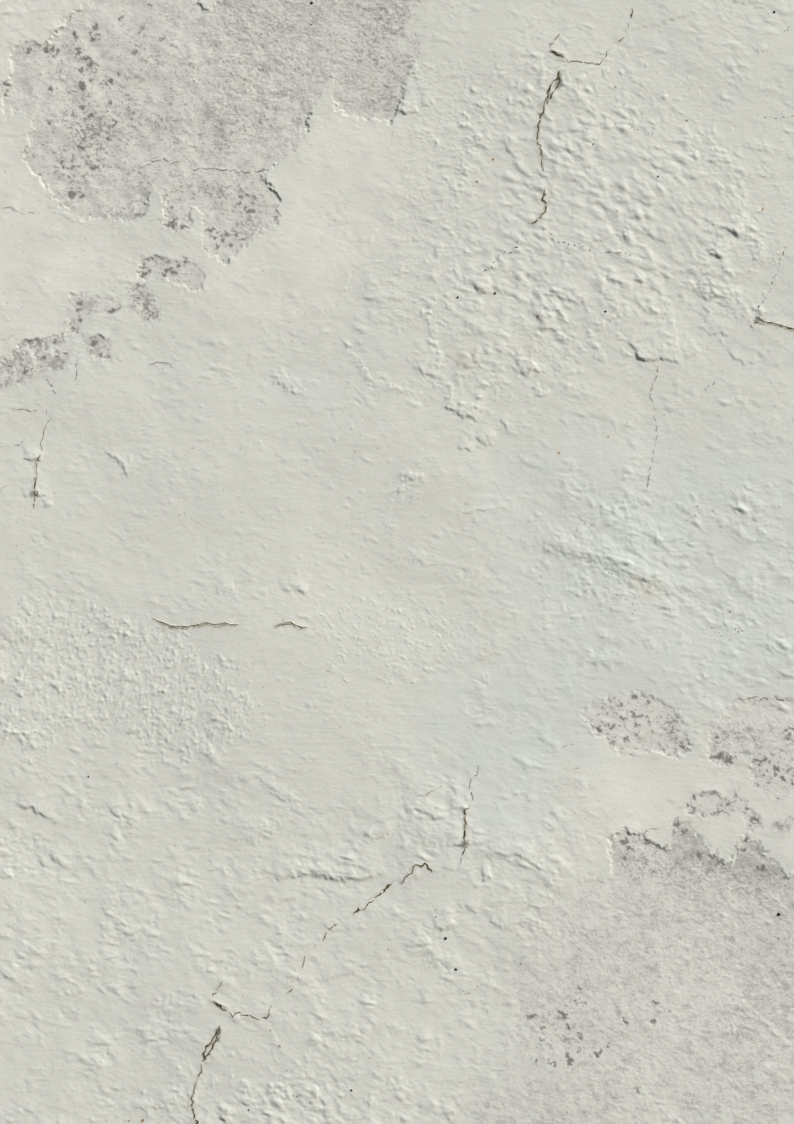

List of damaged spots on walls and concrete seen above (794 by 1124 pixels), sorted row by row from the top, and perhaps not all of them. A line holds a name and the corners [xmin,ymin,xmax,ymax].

peeling [0,0,448,390]
crack [484,9,635,271]
crack [747,247,794,335]
crack [0,352,79,505]
crack [148,612,242,633]
crack [270,611,310,633]
crack [188,855,432,1124]
crack [458,765,479,862]
leakage [423,927,794,1124]
peeling [487,688,794,1102]